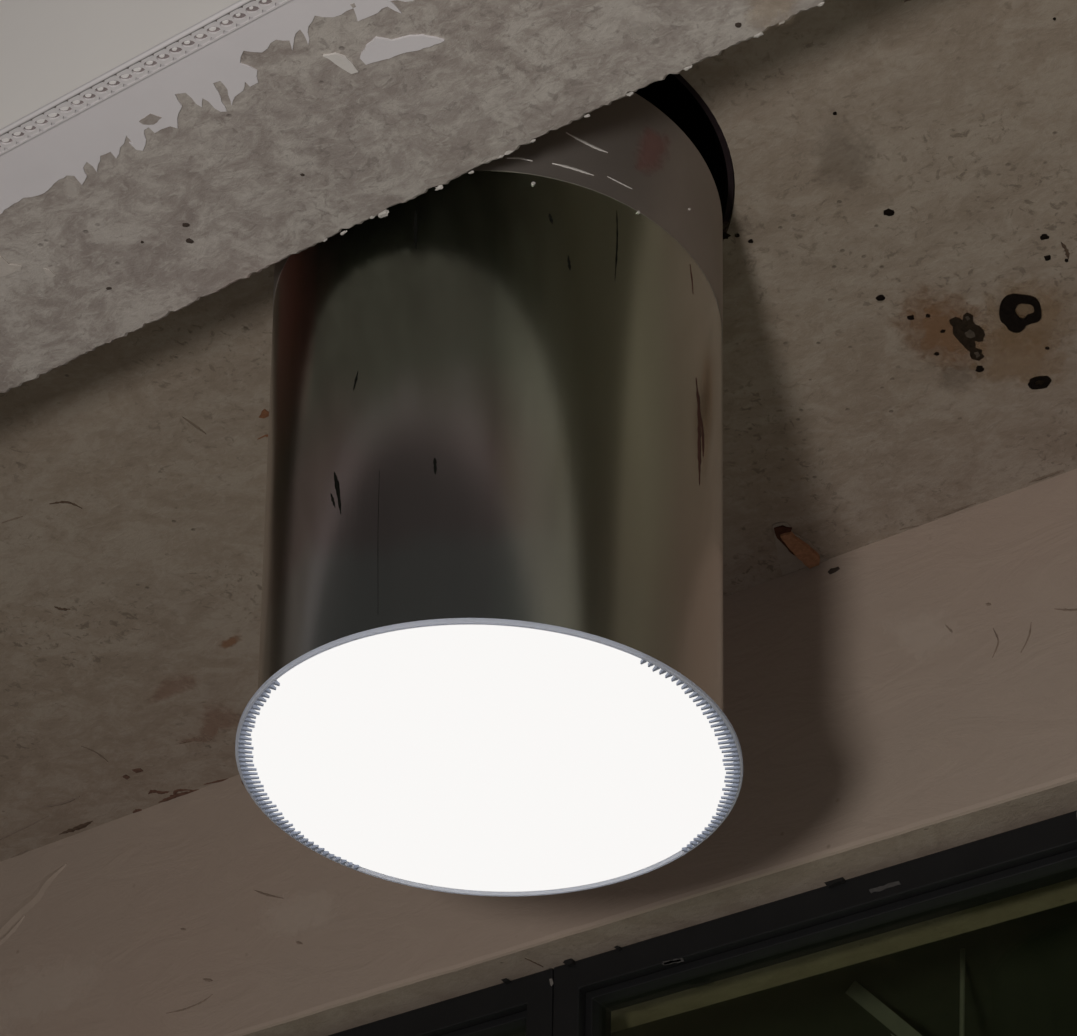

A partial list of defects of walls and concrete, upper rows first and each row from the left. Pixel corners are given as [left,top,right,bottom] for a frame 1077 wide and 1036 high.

peeling [323,34,445,74]
peeling [0,0,414,214]
corrosion [907,301,976,361]